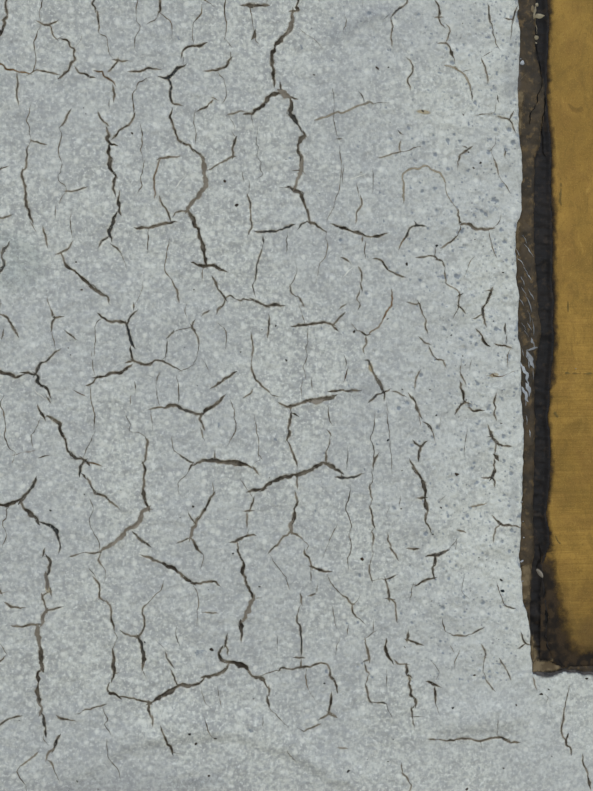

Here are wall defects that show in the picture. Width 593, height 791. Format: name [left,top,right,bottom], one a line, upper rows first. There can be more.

crack [435,1,546,192]
crack [402,146,514,377]
crack [0,0,466,791]
crack [455,360,511,486]
crack [471,503,520,542]
crack [442,619,511,692]
crack [430,730,520,743]